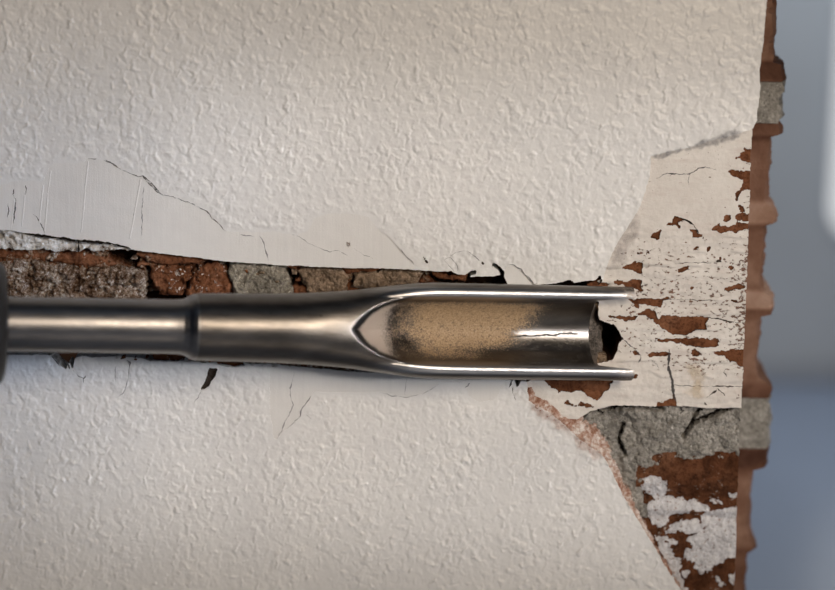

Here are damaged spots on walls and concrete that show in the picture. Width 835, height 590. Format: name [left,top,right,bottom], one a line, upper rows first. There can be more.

crack [7,185,131,252]
crack [94,159,268,258]
peeling [651,216,684,240]
peeling [711,147,751,233]
peeling [504,265,534,285]
peeling [586,252,743,366]
crack [279,376,311,434]
crack [597,338,743,451]
spalling [527,380,740,590]